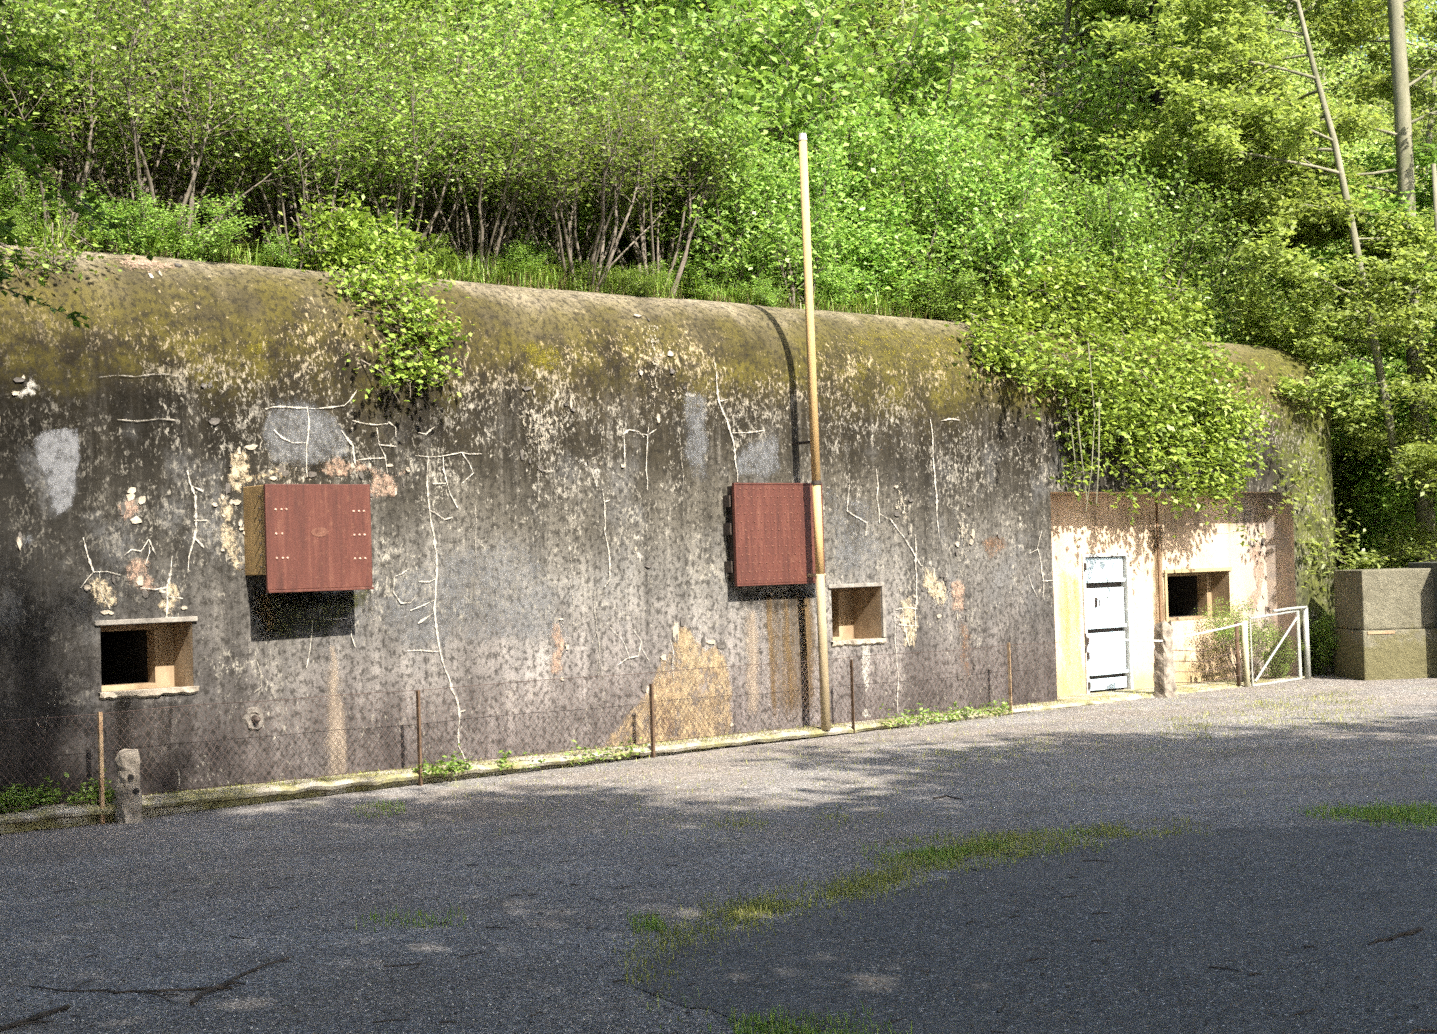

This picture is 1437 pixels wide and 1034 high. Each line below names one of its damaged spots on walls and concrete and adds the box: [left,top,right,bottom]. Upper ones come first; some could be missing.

spalling [120,487,146,524]
spalling [212,444,290,569]
spalling [308,457,410,497]
spalling [84,560,187,615]
crack [265,390,480,761]
corrosion [767,595,813,707]